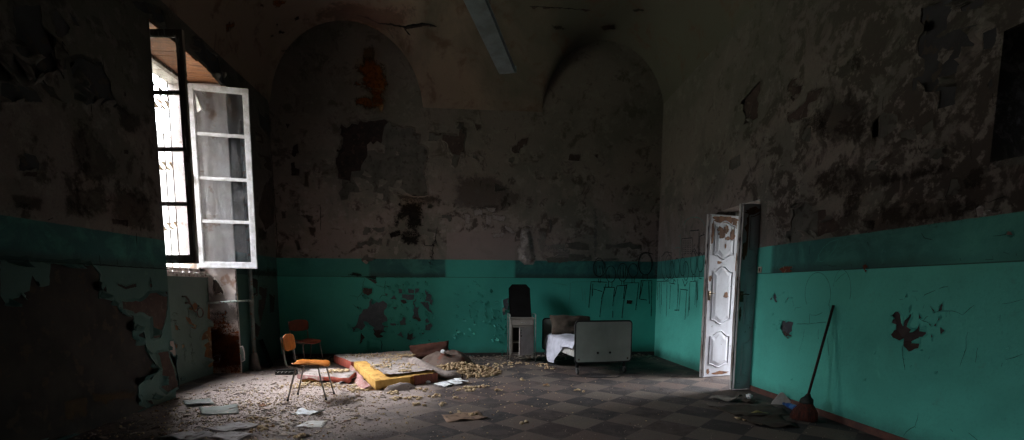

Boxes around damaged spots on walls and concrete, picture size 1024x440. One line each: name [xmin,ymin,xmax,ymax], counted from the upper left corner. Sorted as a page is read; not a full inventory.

crack [357,15,437,35]
peeling [333,116,482,223]
peeling [98,277,179,406]
peeling [347,277,434,345]
peeling [780,319,795,340]
peeling [890,293,946,353]